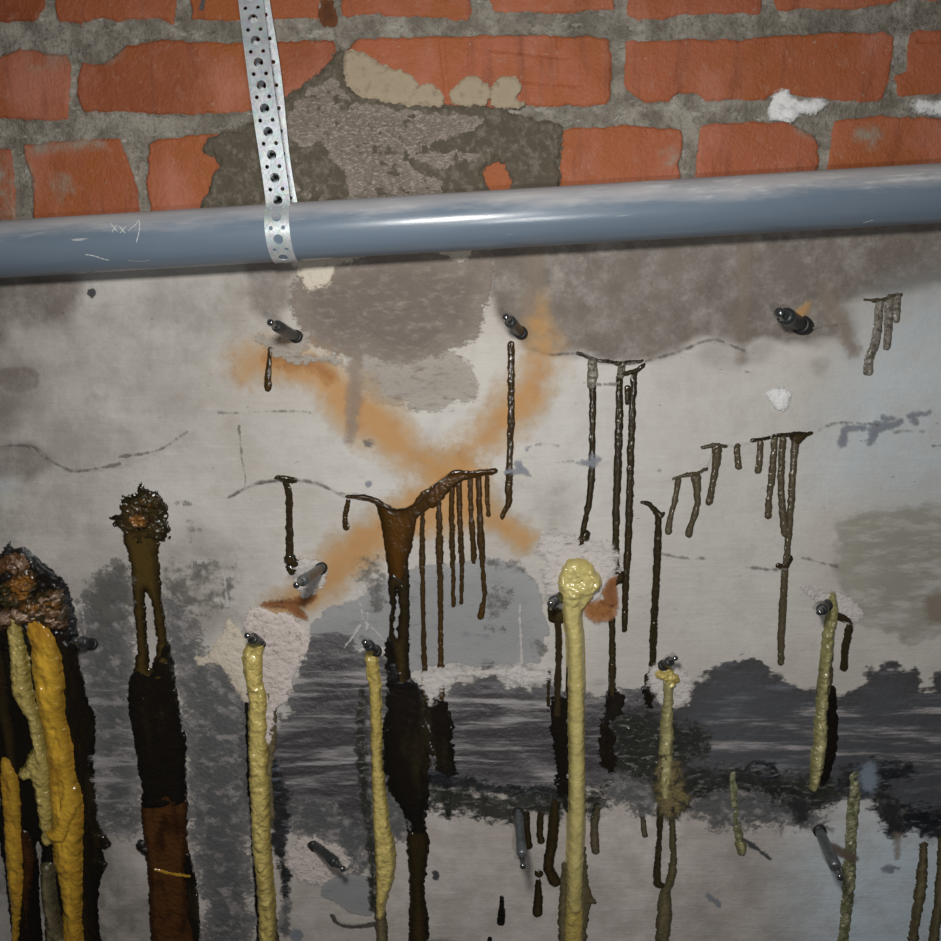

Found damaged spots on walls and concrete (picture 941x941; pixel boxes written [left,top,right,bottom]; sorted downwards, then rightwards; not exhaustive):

leakage [0,650,63,941]
leakage [59,643,112,941]
crack [9,433,185,471]
leakage [109,482,201,941]
flaking render [194,606,311,745]
corrosion [261,518,384,620]
corrosion [234,299,554,551]
leakage [310,341,569,941]
corrosion [584,576,618,623]
leakage [639,804,677,941]
leakage [576,351,813,855]
leakage [673,717,941,941]